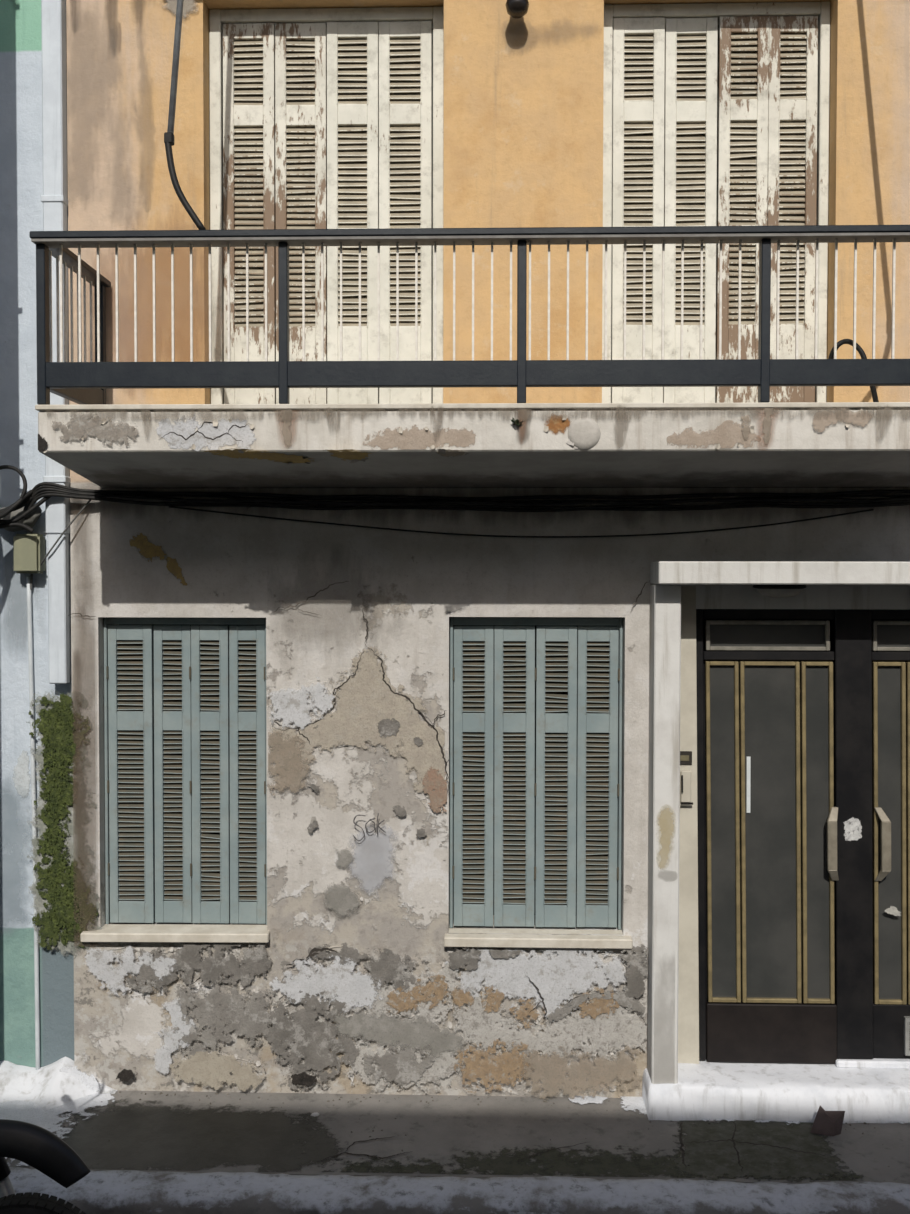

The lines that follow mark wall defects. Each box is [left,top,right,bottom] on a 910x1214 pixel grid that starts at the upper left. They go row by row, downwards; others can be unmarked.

peeling [38,412,139,453]
peeling [156,414,476,465]
peeling [667,420,761,449]
peeling [812,408,873,432]
peeling [129,532,187,586]
spalling [267,646,449,813]
crack [273,610,450,796]
spalling [307,817,319,833]
peeling [323,805,406,918]
peeling [84,943,648,1099]